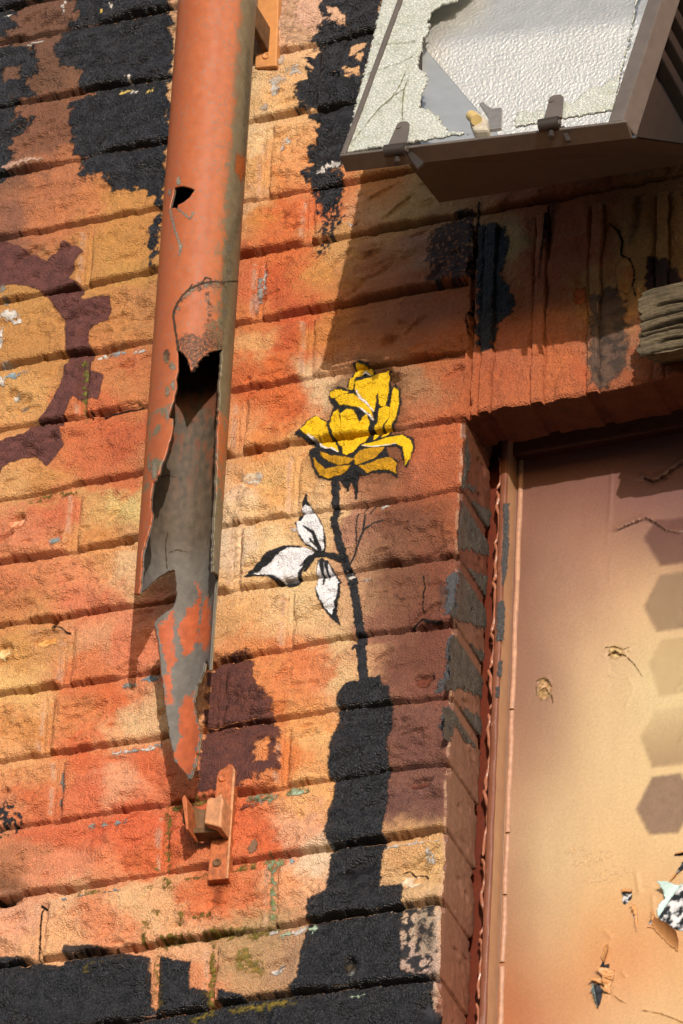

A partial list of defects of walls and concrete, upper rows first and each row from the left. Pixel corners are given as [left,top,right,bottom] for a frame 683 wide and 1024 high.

crack [644,463,682,483]
peeling [622,851,683,951]
peeling [589,944,615,1008]